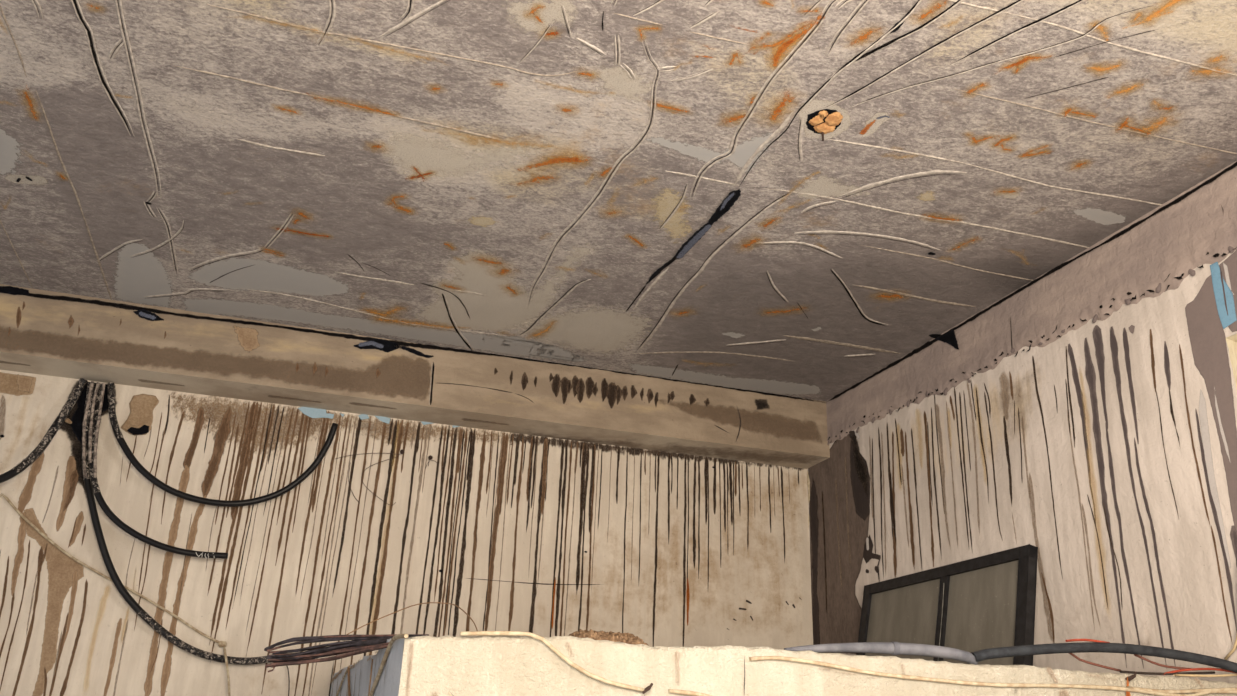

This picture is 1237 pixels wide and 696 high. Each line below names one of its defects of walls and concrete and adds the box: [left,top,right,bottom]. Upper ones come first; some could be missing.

crack [71,0,294,298]
rust [459,134,588,197]
crack [520,0,713,336]
rust [729,10,825,67]
spalling [799,100,890,141]
crack [626,0,1158,352]
rust [1002,55,1046,73]
leakage [0,302,819,696]
leakage [869,372,1055,642]
flaking render [786,246,1237,654]
leakage [1032,325,1176,668]
leakage [1150,329,1210,524]